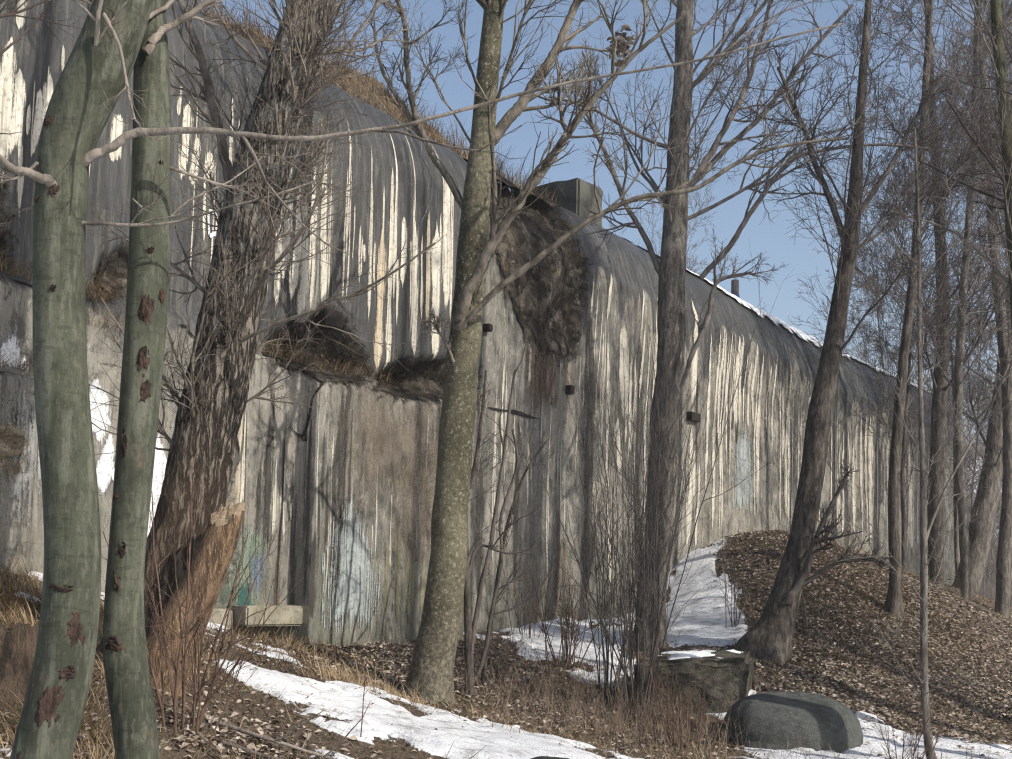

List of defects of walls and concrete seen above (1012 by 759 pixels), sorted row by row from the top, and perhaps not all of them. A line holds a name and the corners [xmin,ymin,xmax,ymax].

peeling [0,332,29,369]
peeling [0,384,42,527]
damp [0,0,53,216]
damp [109,115,125,162]
damp [177,87,216,267]
damp [267,164,332,329]
damp [225,382,429,637]
damp [342,125,454,370]
spalling [489,179,594,363]
damp [556,274,658,602]
damp [686,301,811,546]
damp [830,407,889,542]